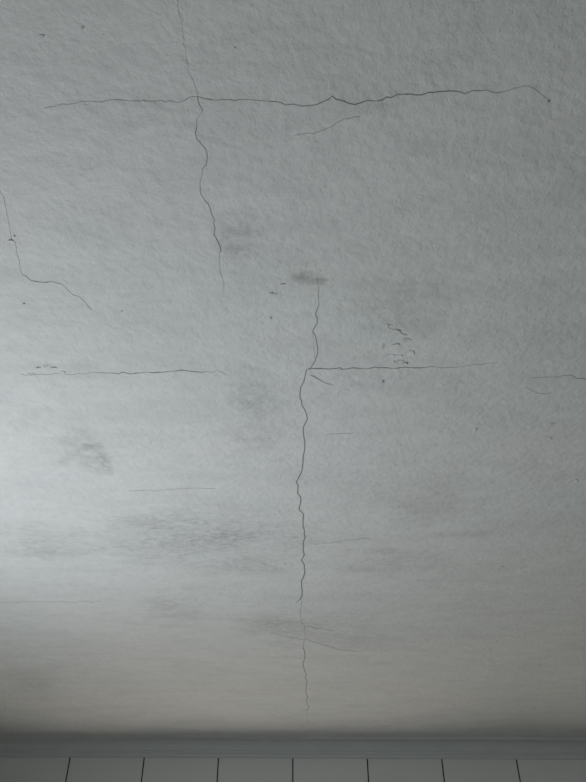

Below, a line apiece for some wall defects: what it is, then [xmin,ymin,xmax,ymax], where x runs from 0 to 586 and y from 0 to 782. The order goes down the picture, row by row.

crack [0,192,92,310]
crack [22,369,227,377]
crack [47,5,547,291]
crack [296,278,498,721]